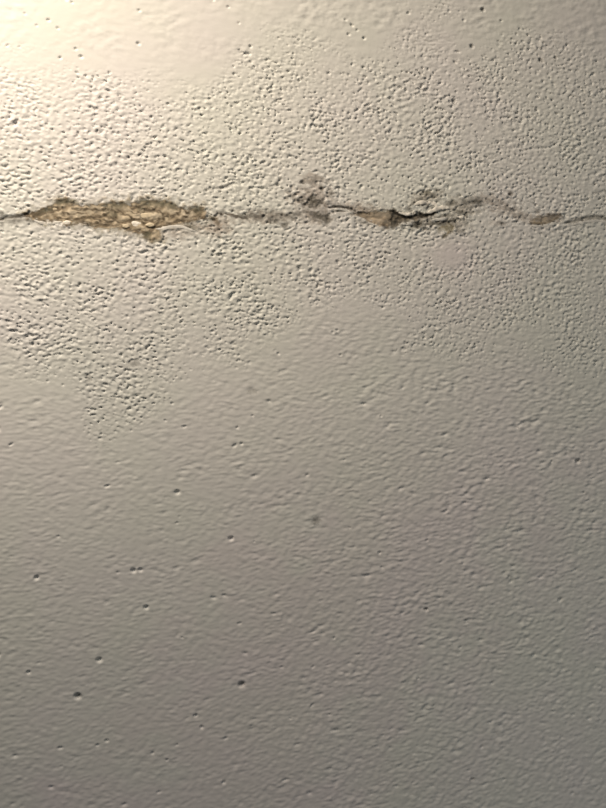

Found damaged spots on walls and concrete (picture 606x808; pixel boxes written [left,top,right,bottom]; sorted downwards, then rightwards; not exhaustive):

crack [0,212,31,222]
peeling [22,197,206,243]
crack [328,205,366,218]
flaking render [358,195,466,237]